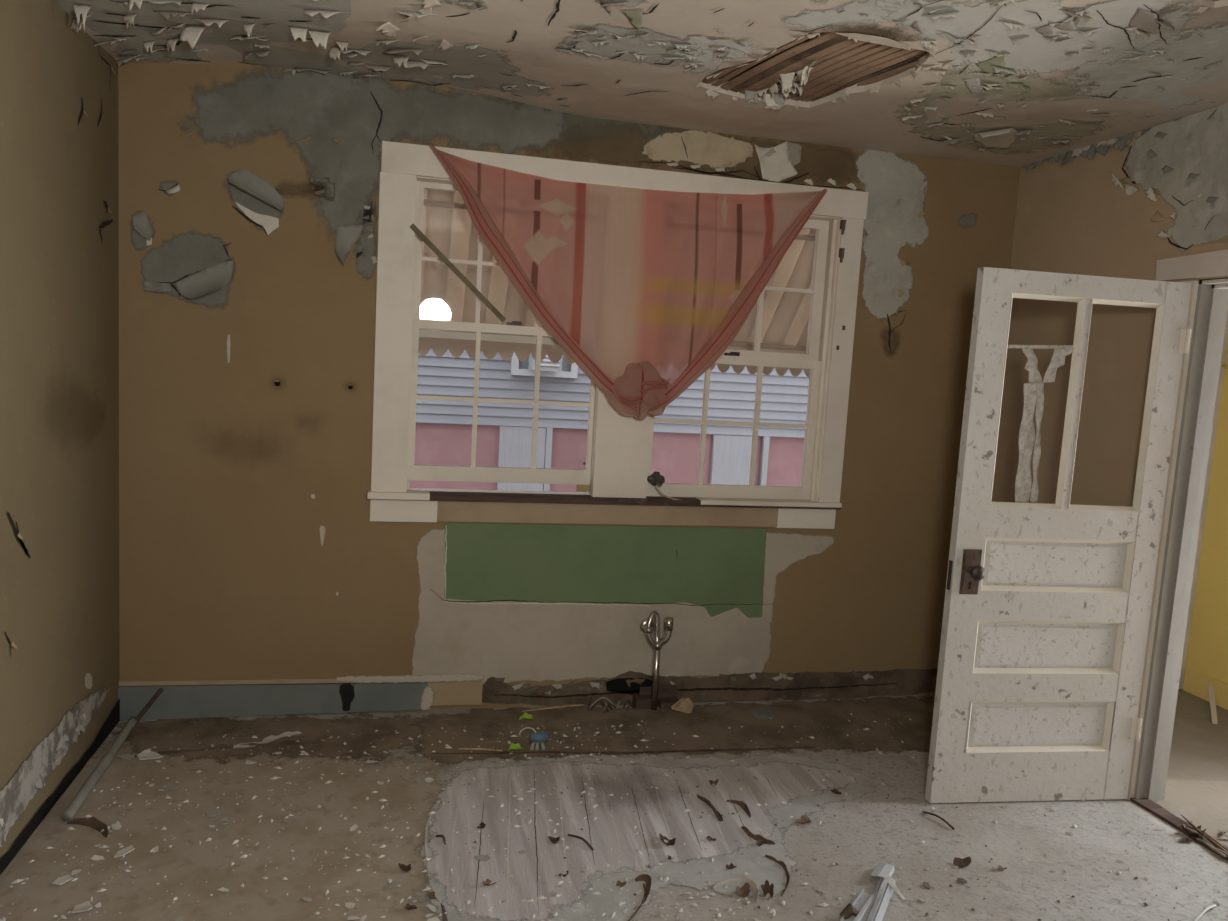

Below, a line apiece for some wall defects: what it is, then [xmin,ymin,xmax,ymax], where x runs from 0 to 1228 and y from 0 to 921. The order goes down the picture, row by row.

peeling [55,0,588,279]
crack [370,91,383,154]
peeling [555,0,1228,251]
peeling [141,232,235,309]
peeling [856,150,929,319]
spalling [545,678,675,695]